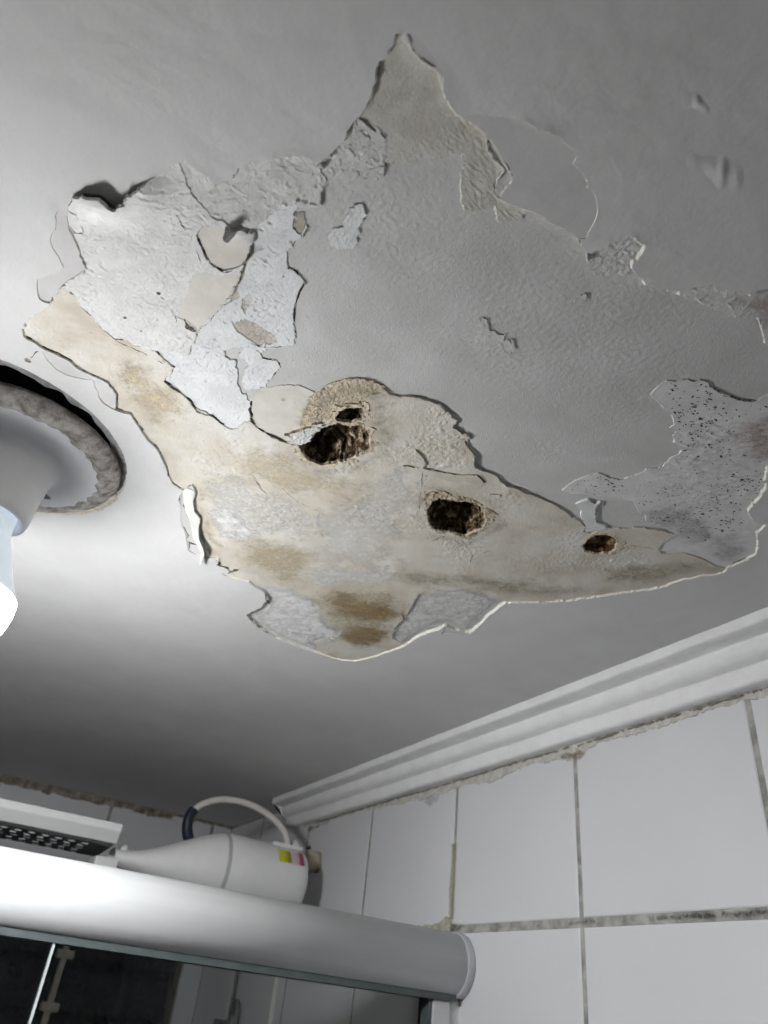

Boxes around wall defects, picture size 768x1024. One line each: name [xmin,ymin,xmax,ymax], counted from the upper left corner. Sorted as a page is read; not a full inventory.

peeling [24,33,768,660]
damp [210,476,517,647]
damp [562,378,768,567]